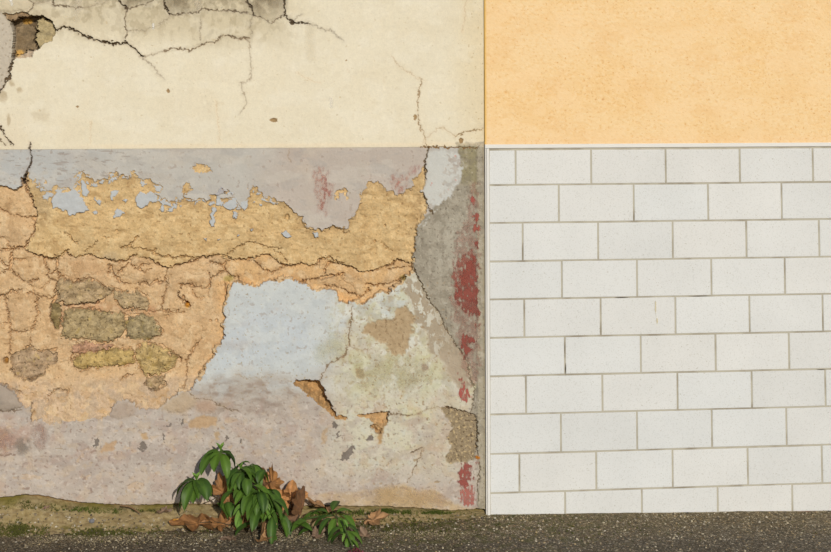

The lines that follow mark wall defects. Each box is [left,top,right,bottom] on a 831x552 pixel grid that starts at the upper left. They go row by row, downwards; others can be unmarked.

crack [0,62,14,93]
spalling [0,12,57,94]
crack [28,0,342,113]
crack [0,126,33,184]
crack [391,56,484,215]
spalling [0,166,428,426]
crack [319,307,371,381]
crack [388,268,481,501]